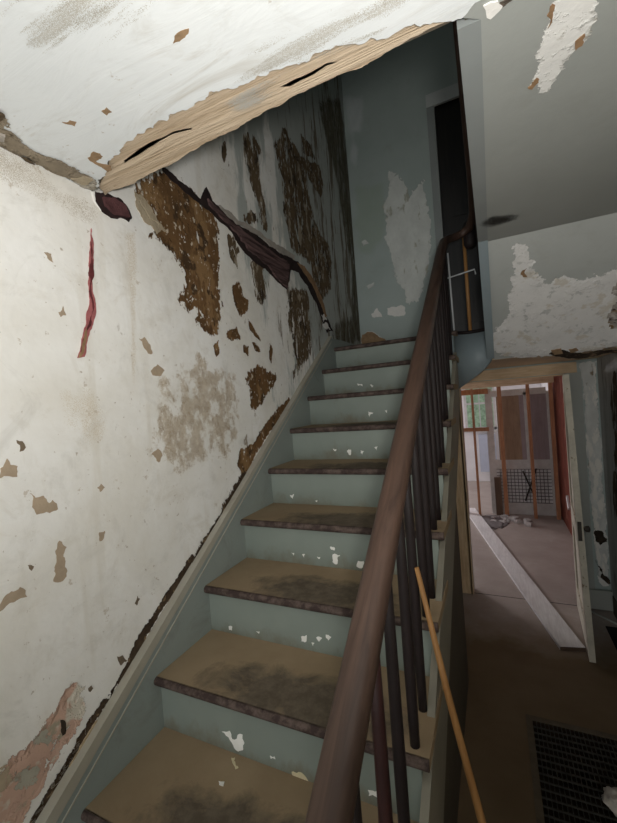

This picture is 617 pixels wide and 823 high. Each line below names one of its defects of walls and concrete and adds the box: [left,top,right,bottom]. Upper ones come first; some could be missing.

crack [483,0,512,19]
peeling [528,0,599,94]
peeling [0,0,480,410]
flaking render [0,459,18,478]
flaking render [30,493,58,515]
flaking render [237,397,290,474]
flaking render [493,243,617,586]
flaking render [0,587,27,611]
flaking render [53,541,67,582]
flaking render [0,682,93,823]